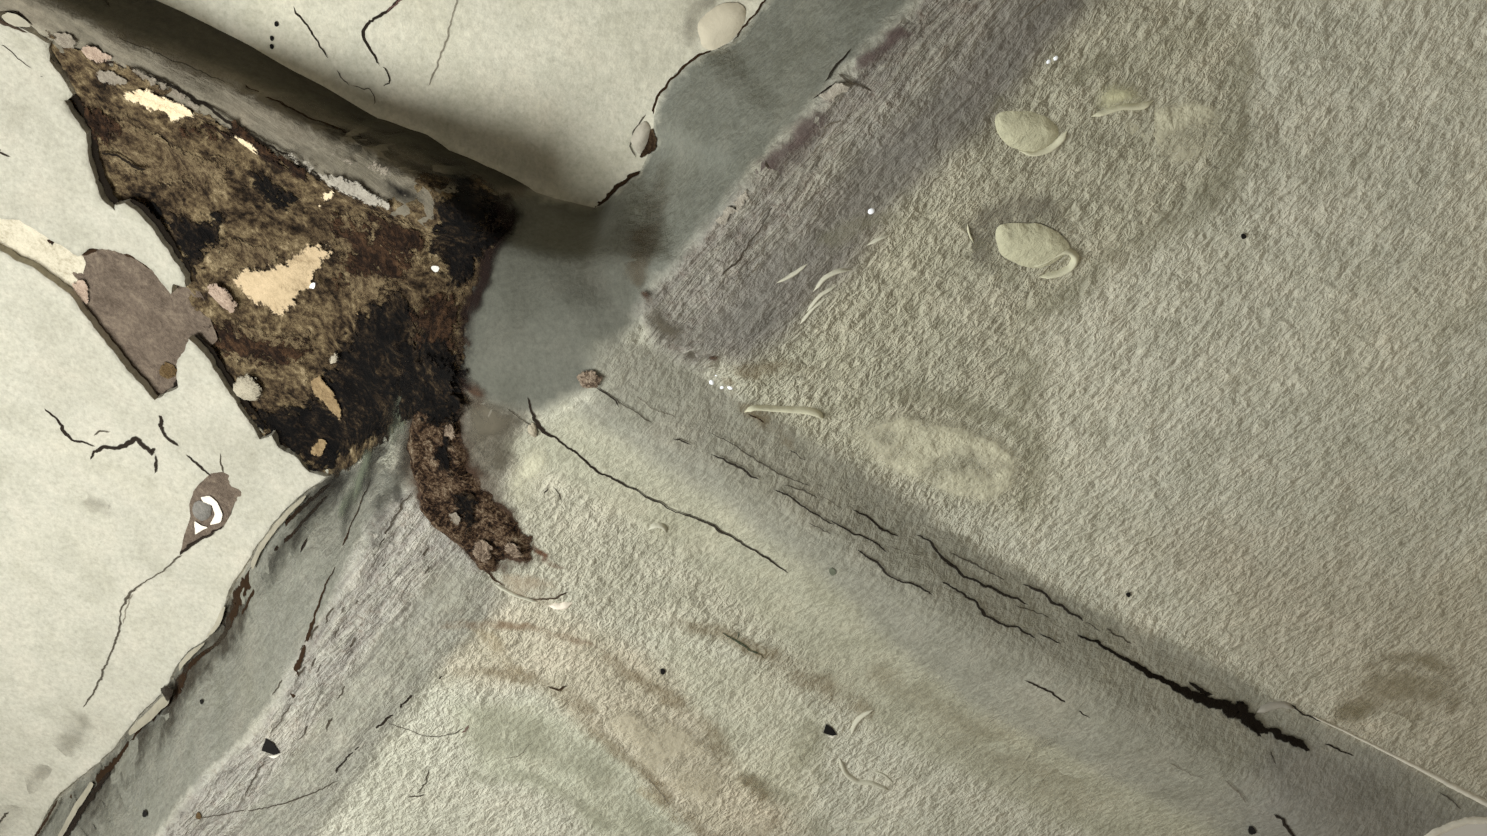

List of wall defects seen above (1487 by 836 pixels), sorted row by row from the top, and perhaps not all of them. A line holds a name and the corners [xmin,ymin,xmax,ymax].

peeling [0,12,30,33]
crack [105,0,372,144]
crack [294,0,402,104]
crack [429,0,458,85]
water stain [641,292,678,336]
crack [44,408,224,476]
flaking render [0,32,508,836]
crack [507,399,786,572]
water stain [872,418,1012,498]
crack [616,397,1354,764]
spalling [1311,715,1487,836]